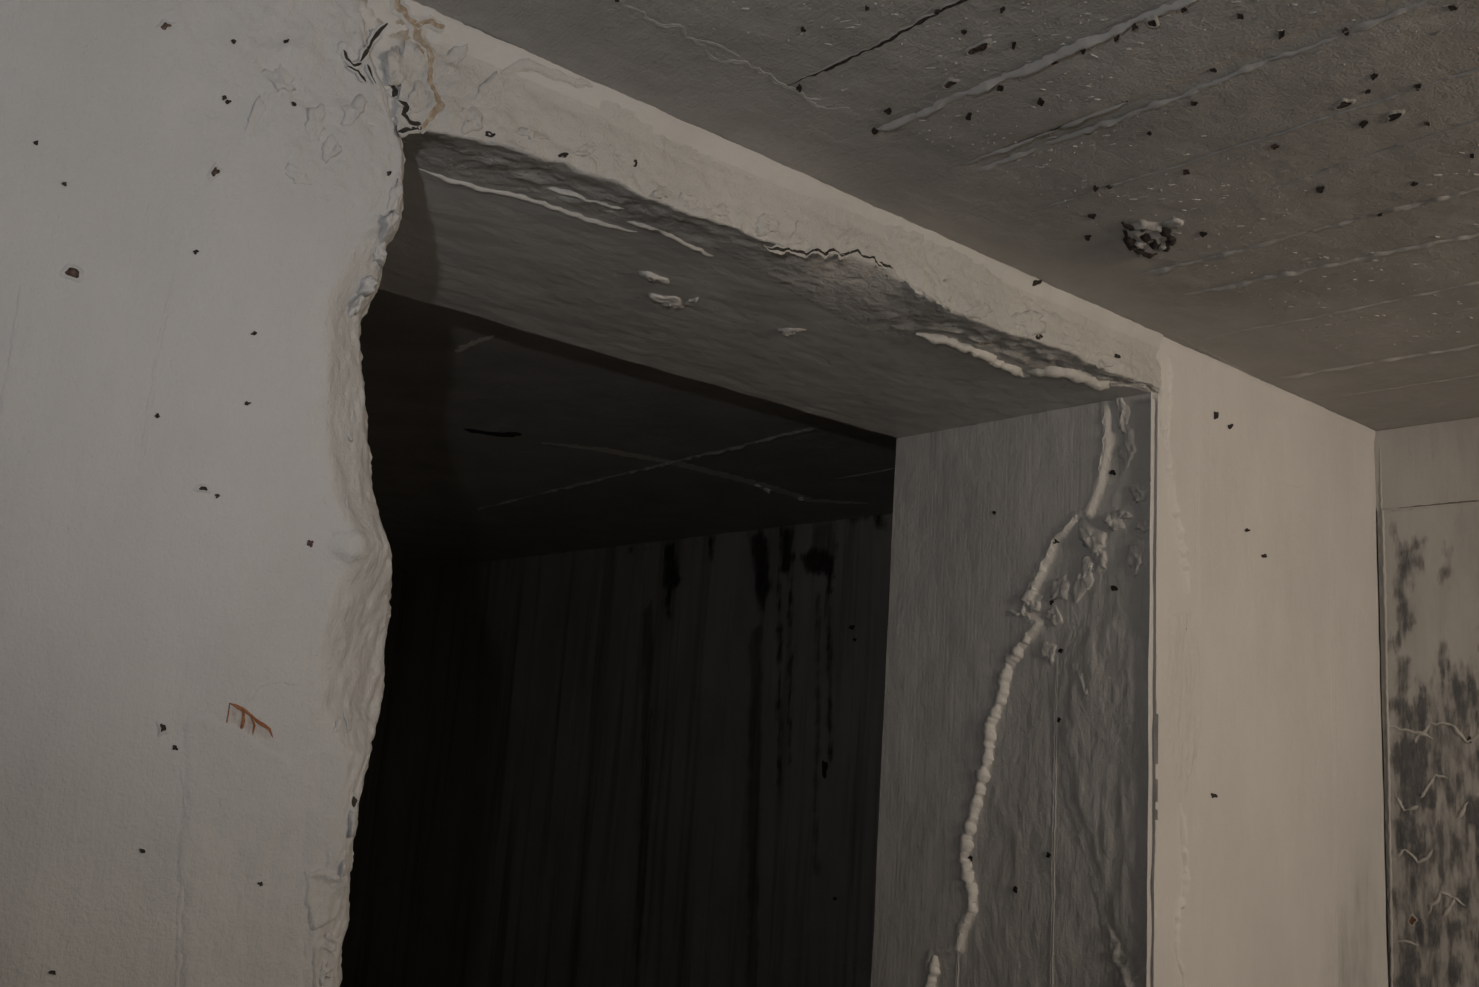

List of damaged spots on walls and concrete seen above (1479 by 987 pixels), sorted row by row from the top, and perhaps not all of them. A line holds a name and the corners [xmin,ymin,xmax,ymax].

crack [342,0,451,138]
crack [622,0,970,110]
spalling [908,0,1479,348]
crack [764,244,893,270]
crack [1175,333,1263,381]
spalling [222,0,1161,987]
water stain [752,528,833,709]
water stain [1396,540,1420,642]
rust [226,703,273,738]
water stain [1389,647,1479,987]